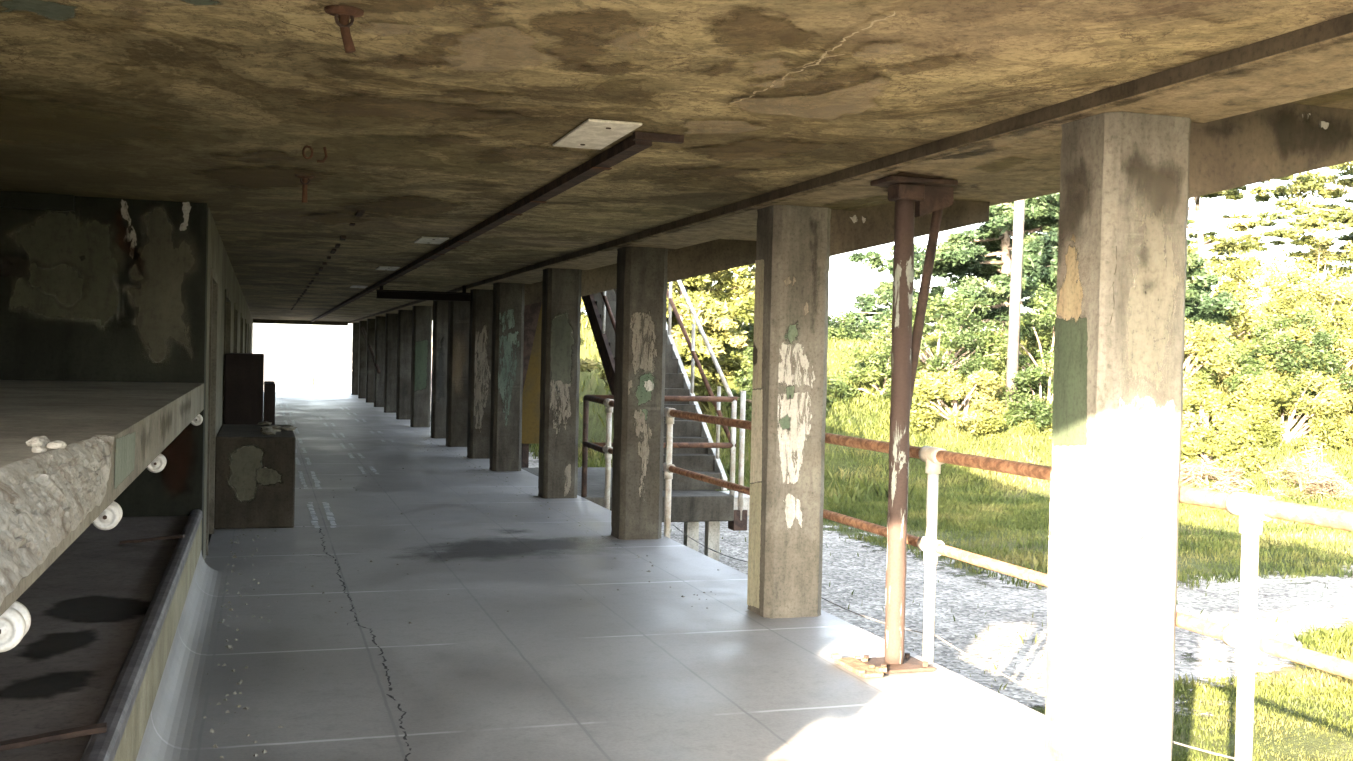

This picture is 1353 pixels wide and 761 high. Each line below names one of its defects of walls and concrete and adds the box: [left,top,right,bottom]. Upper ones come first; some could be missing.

water stain [305,0,507,70]
water stain [530,8,651,76]
water stain [699,8,821,76]
crack [727,11,896,105]
water stain [785,56,961,96]
peeling [5,203,198,365]
water stain [1057,161,1089,264]
peeling [1123,184,1185,399]
peeling [628,311,658,501]
peeling [777,302,816,530]
spalling [0,432,135,606]
crack [311,528,412,761]